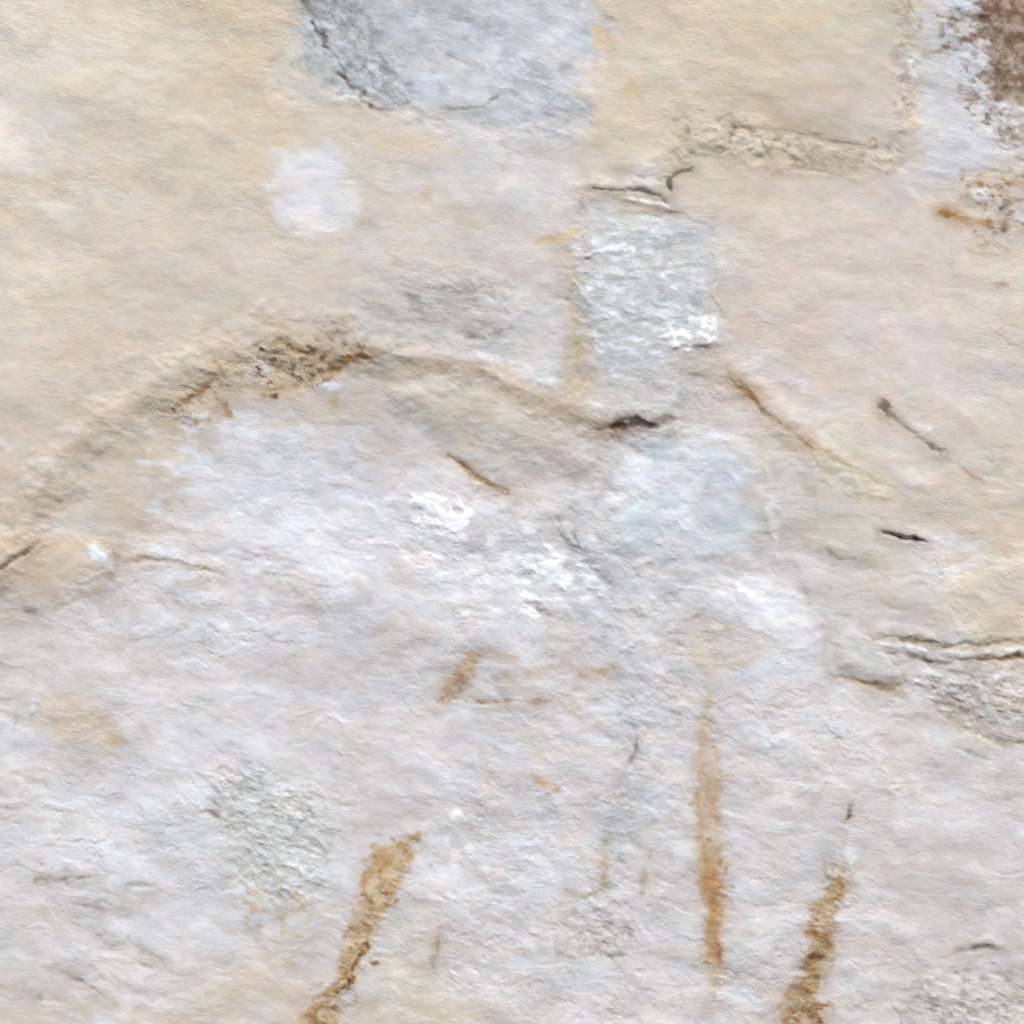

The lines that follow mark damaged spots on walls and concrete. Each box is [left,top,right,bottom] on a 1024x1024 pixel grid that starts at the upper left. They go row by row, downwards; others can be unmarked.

peeling [261,0,738,409]
crack [579,114,720,216]
corrosion [150,302,386,451]
crack [584,412,684,444]
crack [874,396,997,489]
crack [816,615,1024,696]
corrosion [667,615,769,1003]
corrosion [294,829,423,1024]
corrosion [771,798,862,1024]